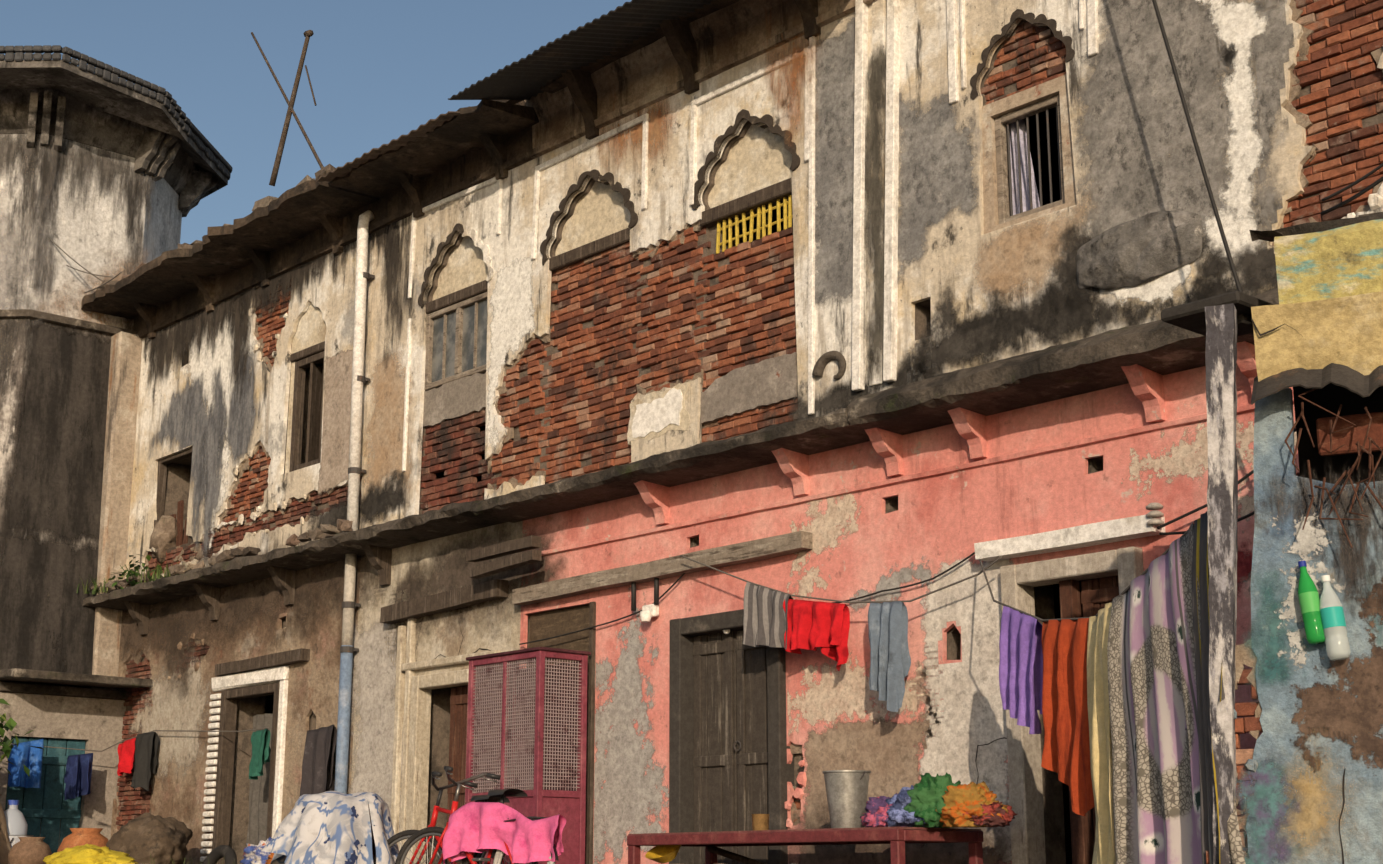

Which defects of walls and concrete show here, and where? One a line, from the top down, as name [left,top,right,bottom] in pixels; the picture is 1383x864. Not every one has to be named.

damp [0,133,153,688]
flaking render [145,442,362,575]
flaking render [249,284,292,372]
damp [127,215,414,553]
damp [486,257,536,447]
flaking render [487,329,551,490]
flaking render [627,222,705,445]
damp [791,0,1295,421]
flaking render [1272,0,1383,246]
damp [119,528,561,849]
peeling [593,587,669,864]
peeling [1270,510,1383,773]